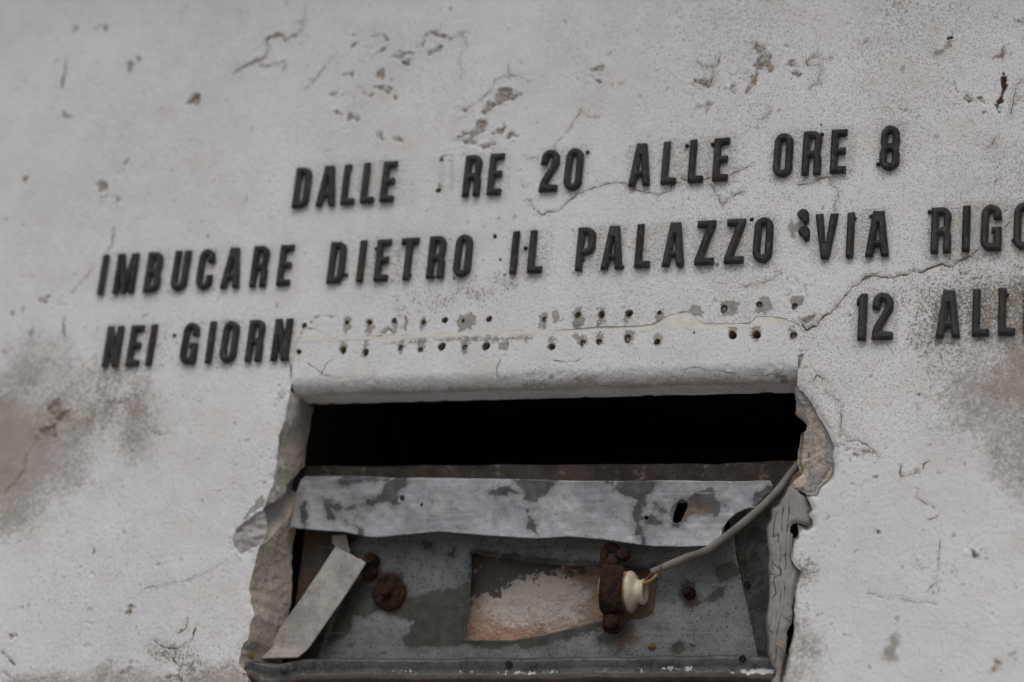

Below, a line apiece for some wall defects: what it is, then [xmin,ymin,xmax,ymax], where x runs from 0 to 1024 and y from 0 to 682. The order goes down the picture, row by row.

crack [234,10,306,73]
spalling [457,88,522,150]
corrosion [994,72,1008,112]
crack [521,156,753,216]
crack [801,249,979,331]
damp [0,360,104,529]
spalling [790,386,835,499]
spalling [233,511,268,554]